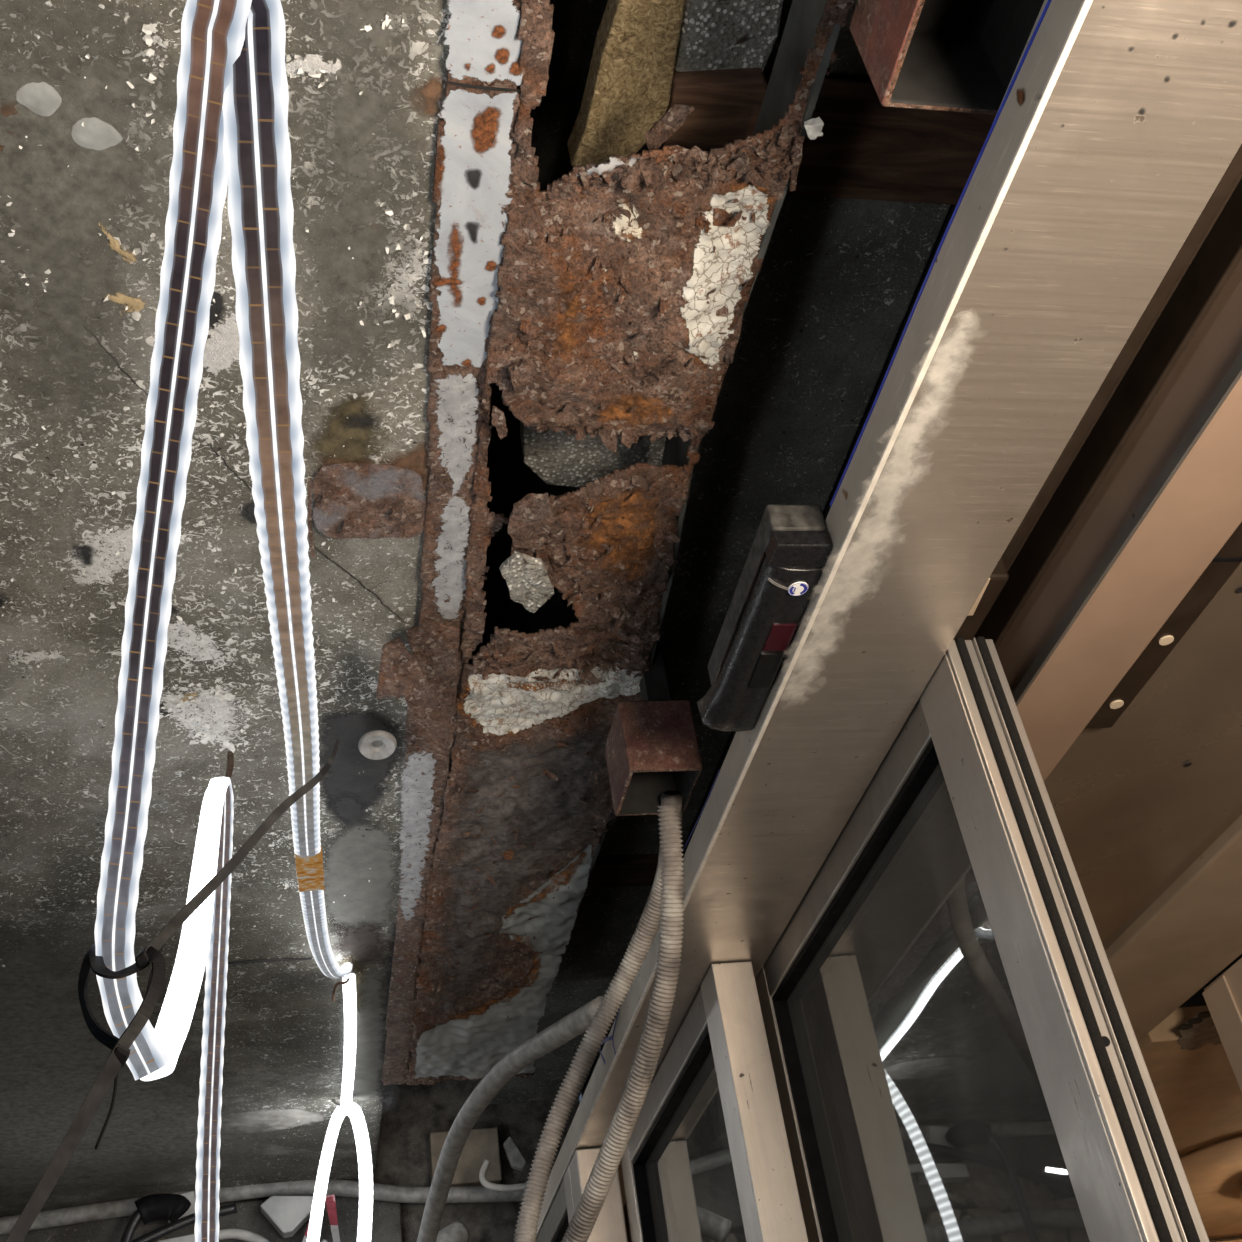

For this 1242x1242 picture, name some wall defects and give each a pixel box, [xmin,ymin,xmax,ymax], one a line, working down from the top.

rust [485,25,523,75]
rust [435,148,444,194]
rust [471,107,501,153]
peeling [576,157,639,177]
rust [526,104,824,200]
rust [595,208,631,223]
rust [672,198,756,253]
rust [434,225,463,307]
rust [507,237,740,454]
rust [491,406,508,440]
damp [780,312,976,703]
rust [480,473,681,684]